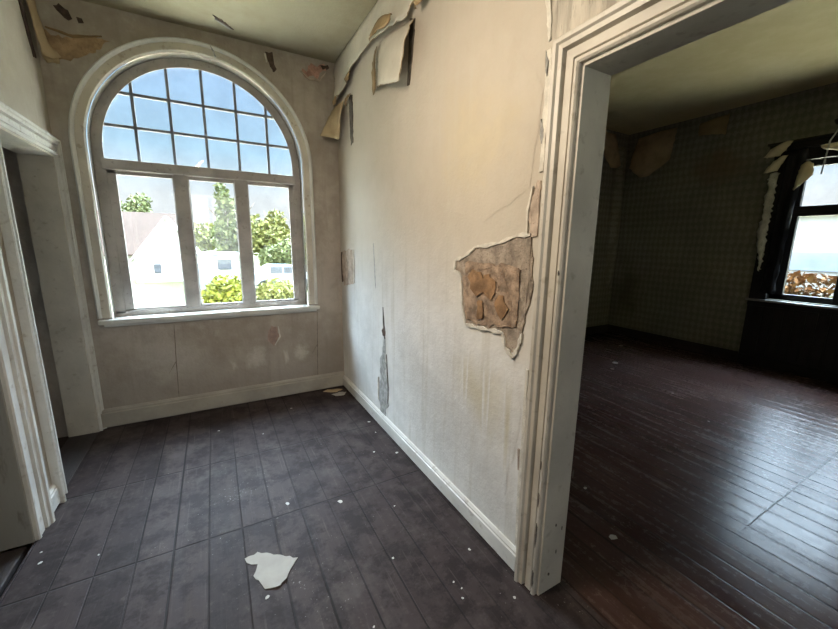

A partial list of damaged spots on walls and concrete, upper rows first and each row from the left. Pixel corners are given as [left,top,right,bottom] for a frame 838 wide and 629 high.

flaking render [53,3,84,23]
flaking render [42,26,110,64]
peeling [369,13,392,95]
flaking render [453,0,621,358]